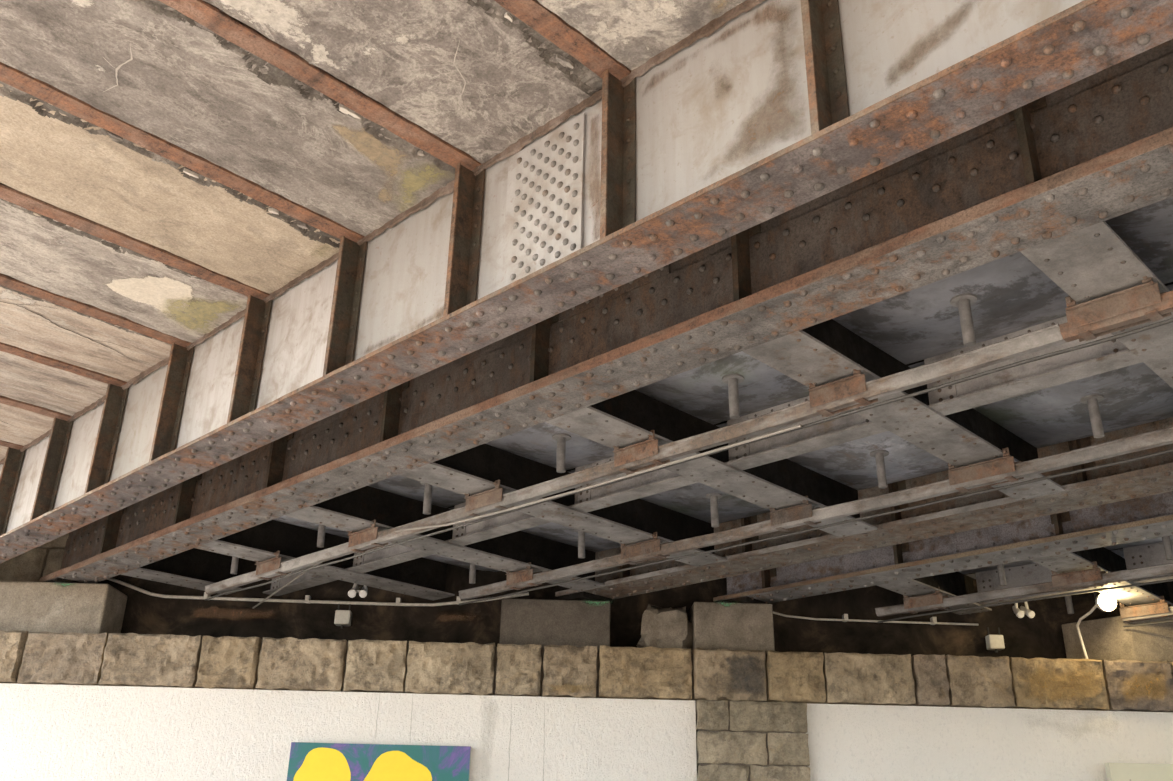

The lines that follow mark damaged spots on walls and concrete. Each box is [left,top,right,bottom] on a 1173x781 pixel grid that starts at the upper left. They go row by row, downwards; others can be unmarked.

peeling [0,198,201,314]
spalling [0,285,172,346]